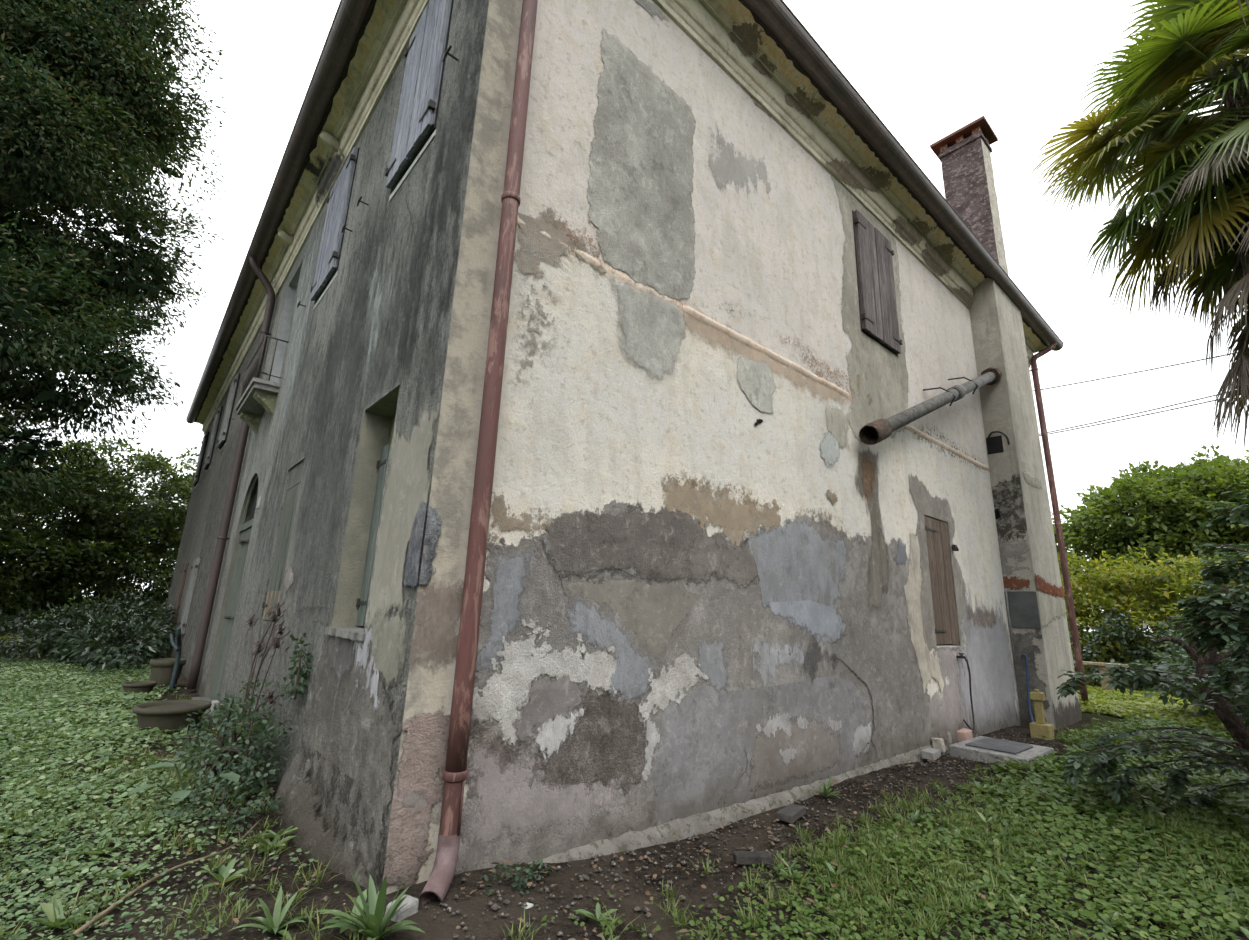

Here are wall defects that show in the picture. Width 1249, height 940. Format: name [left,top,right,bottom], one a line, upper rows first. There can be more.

flaking render [514,29,696,379]
peeling [709,128,771,193]
leakage [257,0,485,604]
flaking render [737,356,776,426]
peeling [783,339,873,406]
flaking render [404,502,442,589]
leakage [324,626,365,687]
leakage [409,582,463,669]
flaking render [457,475,953,873]
flaking render [300,616,450,893]
leakage [455,748,634,875]